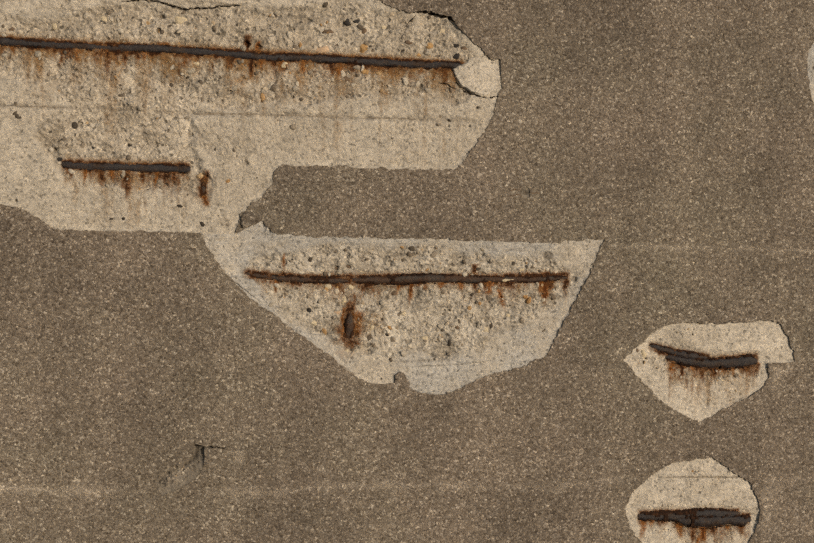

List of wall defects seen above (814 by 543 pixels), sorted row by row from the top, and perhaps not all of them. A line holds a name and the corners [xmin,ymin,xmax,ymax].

corrosion [0,35,464,95]
corrosion [63,159,190,195]
corrosion [198,171,209,205]
spalling [0,0,605,395]
corrosion [245,256,426,348]
corrosion [437,264,569,303]
corrosion [654,343,760,382]
spalling [623,320,795,422]
spalling [157,444,213,495]
spalling [625,457,761,543]
corrosion [639,509,746,543]